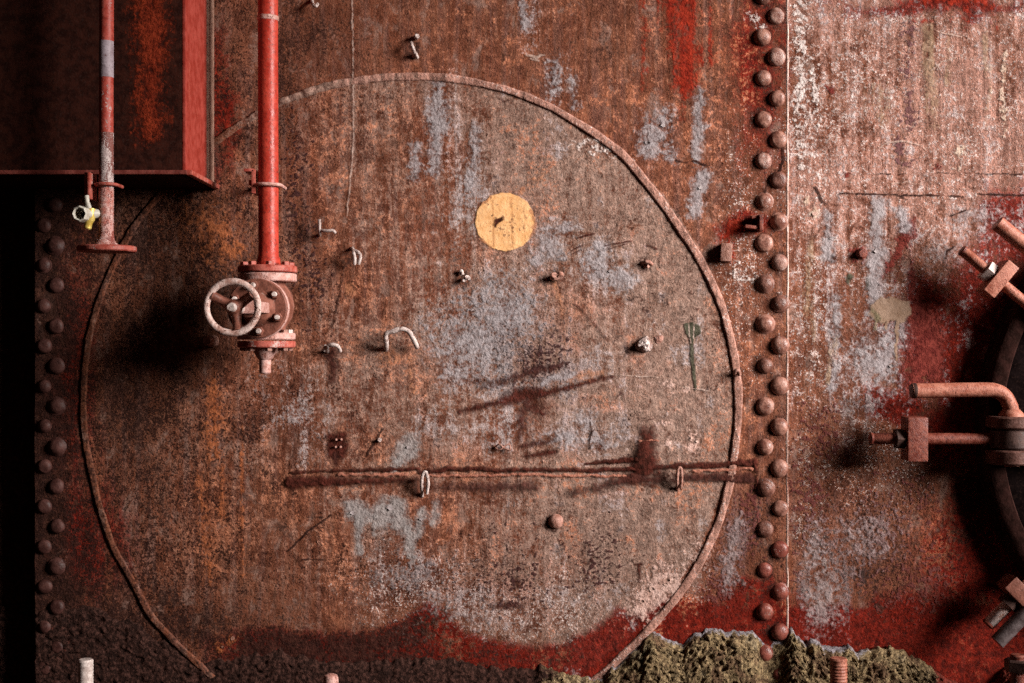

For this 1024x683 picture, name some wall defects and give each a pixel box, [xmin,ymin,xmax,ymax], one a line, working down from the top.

rust [130,0,173,146]
peeling [638,108,677,161]
peeling [687,89,713,218]
peeling [790,0,820,177]
peeling [866,196,912,316]
rust [408,271,614,457]
peeling [827,295,909,392]
rust [326,431,350,466]
peeling [345,496,439,562]
rust [363,500,651,632]
rust [695,485,771,609]
rust [779,375,977,628]